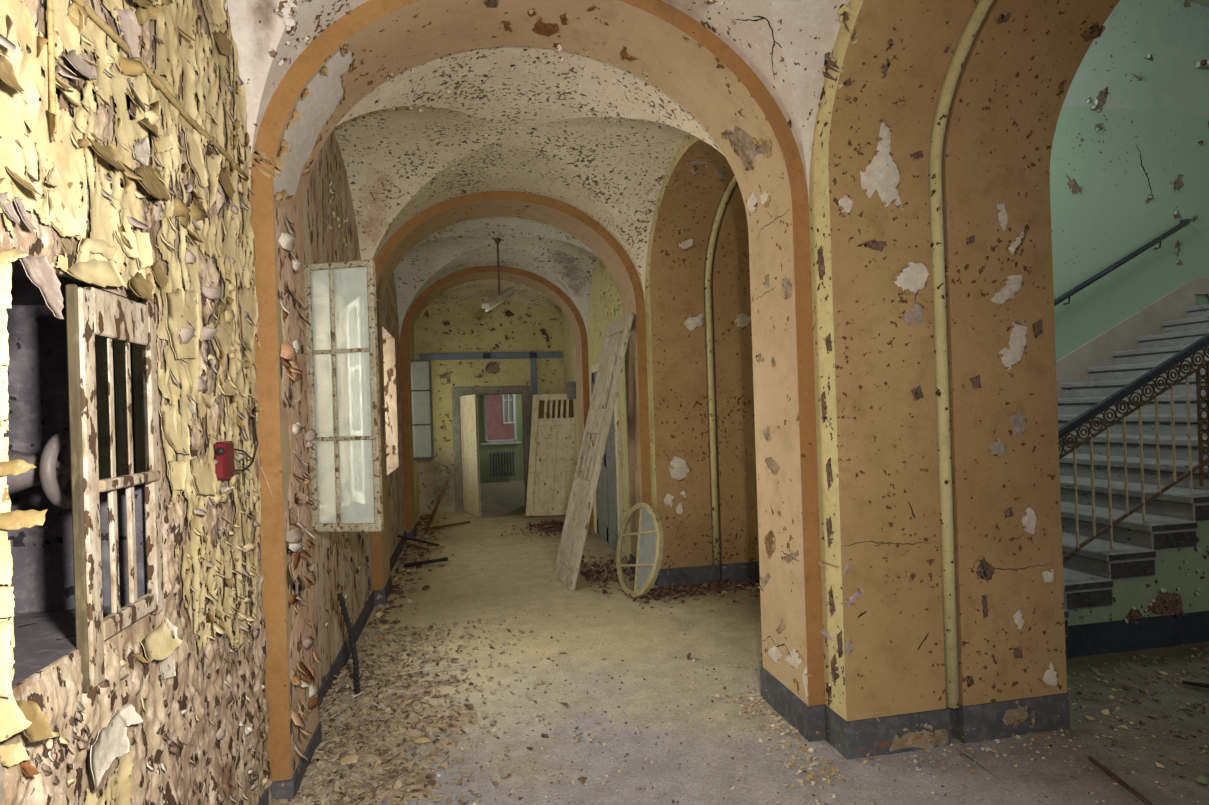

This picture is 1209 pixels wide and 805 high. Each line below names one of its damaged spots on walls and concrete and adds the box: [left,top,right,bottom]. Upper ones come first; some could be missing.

peeling [524,8,569,65]
peeling [821,52,852,89]
peeling [721,125,772,171]
peeling [838,118,905,213]
peeling [817,245,825,280]
peeling [892,262,929,325]
peeling [991,274,1024,304]
peeling [998,319,1043,371]
peeling [0,0,372,803]
peeling [662,457,691,517]
peeling [825,457,834,491]
peeling [973,555,996,619]